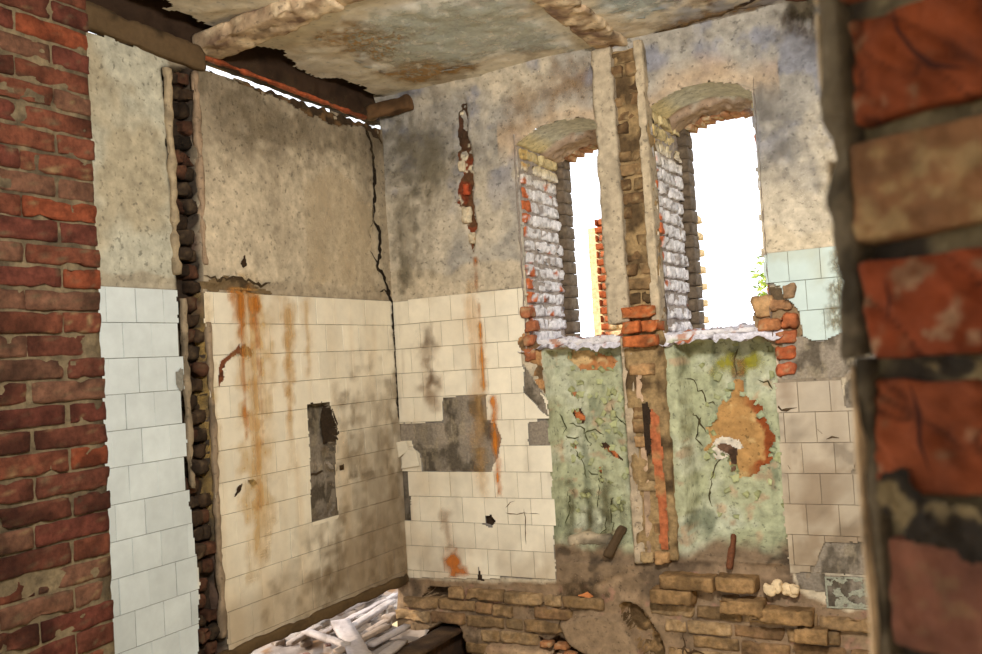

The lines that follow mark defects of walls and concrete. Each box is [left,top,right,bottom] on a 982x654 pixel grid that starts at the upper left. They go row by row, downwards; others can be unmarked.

damp [315,22,401,61]
damp [385,63,474,82]
flaking render [457,103,478,252]
crack [365,130,399,416]
corrosion [230,288,264,396]
peeling [307,402,339,521]
peeling [400,394,502,473]
corrosion [479,323,499,456]
peeling [704,372,782,500]
spalling [750,282,873,408]
peeling [796,541,868,610]